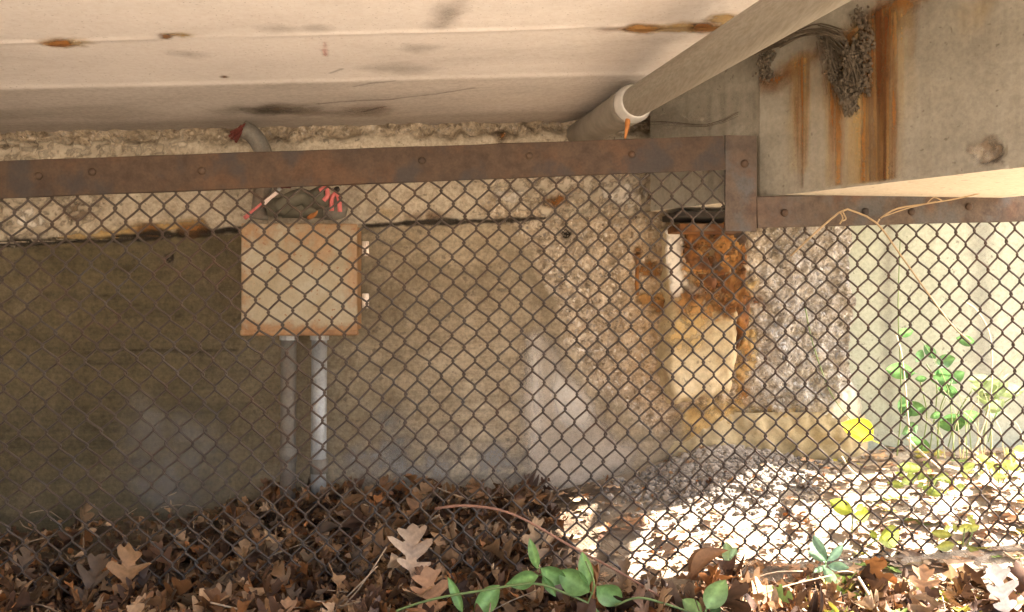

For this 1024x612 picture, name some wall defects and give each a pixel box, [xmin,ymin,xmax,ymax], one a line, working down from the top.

corrosion [624,15,734,34]
corrosion [43,40,83,48]
corrosion [828,6,903,184]
corrosion [634,247,660,278]
corrosion [638,222,762,404]